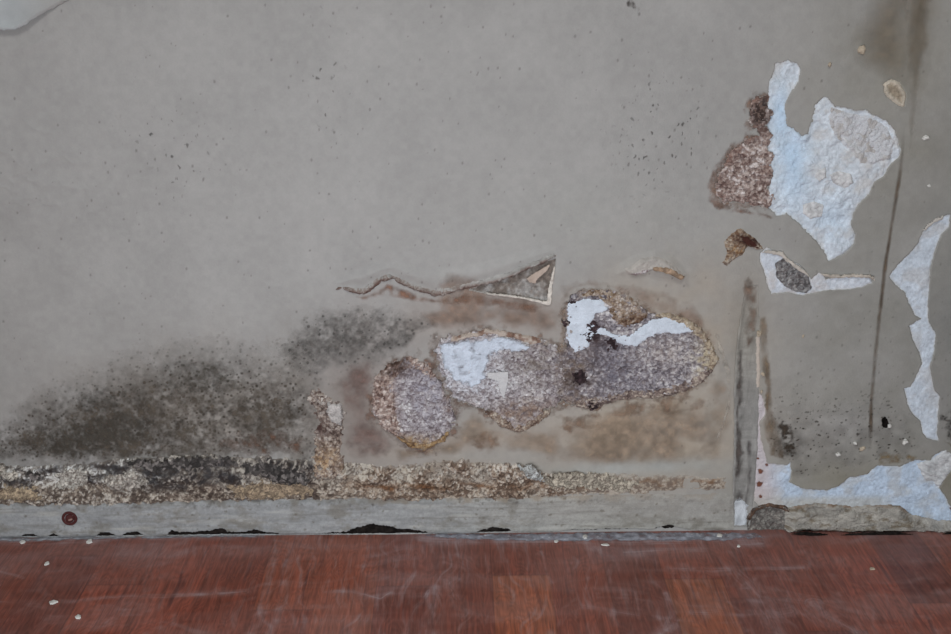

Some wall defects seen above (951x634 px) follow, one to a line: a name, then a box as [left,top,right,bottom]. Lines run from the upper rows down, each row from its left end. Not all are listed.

peeling [0,0,67,31]
flaking render [713,60,901,261]
flaking render [883,79,906,107]
peeling [336,254,556,310]
leakage [0,287,726,507]
flaking render [366,289,719,453]
flaking render [746,214,951,533]